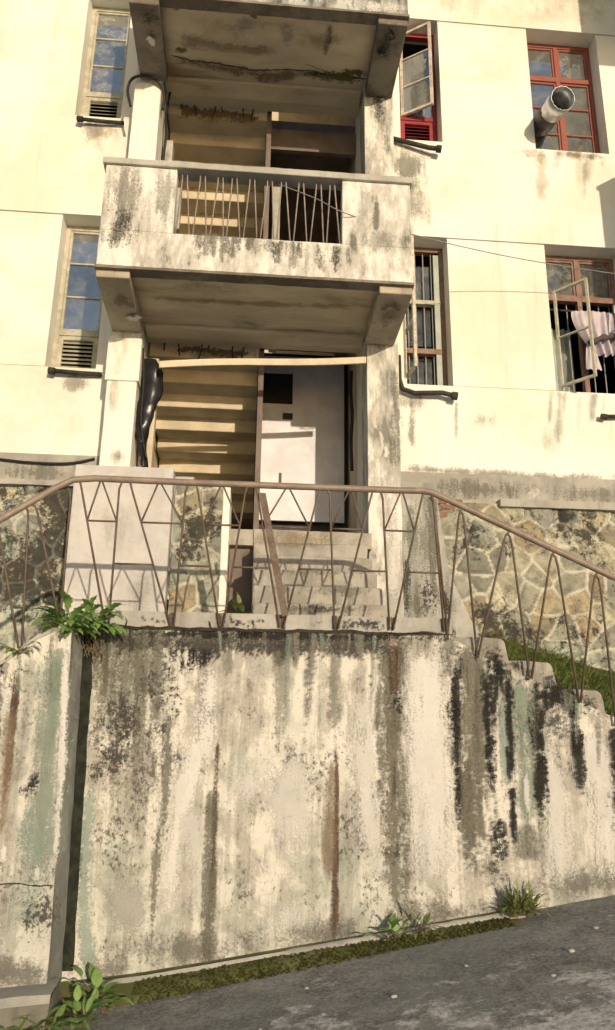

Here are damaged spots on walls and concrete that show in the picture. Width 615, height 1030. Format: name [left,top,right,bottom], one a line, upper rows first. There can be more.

damp [352,1,405,12]
crack [174,56,365,82]
spalling [178,104,262,125]
damp [102,206,139,247]
damp [203,234,254,261]
damp [317,245,342,272]
corrosion [327,616,342,727]
damp [88,465,615,977]
corrosion [0,676,20,831]
corrosion [322,750,339,937]
crack [0,881,52,889]